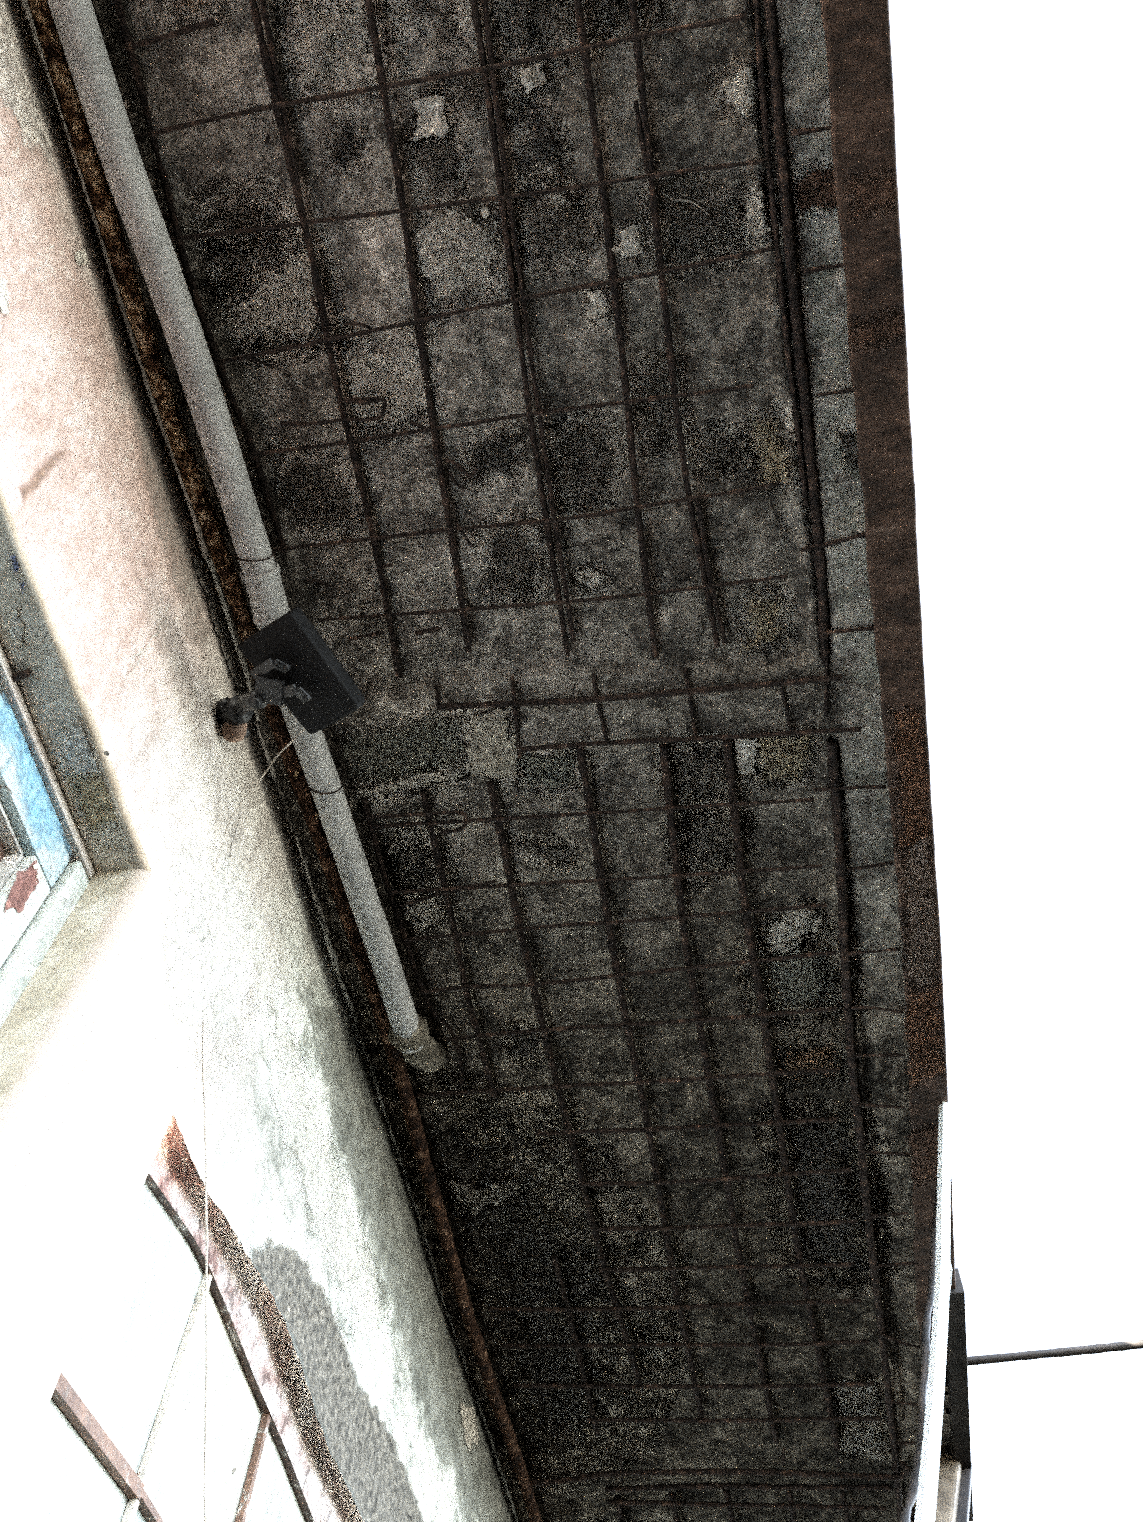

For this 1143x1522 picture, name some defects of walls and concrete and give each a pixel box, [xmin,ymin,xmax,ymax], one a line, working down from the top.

corrosion [22,455,59,496]
spalling [113,0,861,1418]
water stain [760,948,843,1012]
peeling [904,836,938,987]
water stain [415,1111,632,1452]
water stain [775,1112,866,1283]
flaking render [250,1234,435,1522]
spalling [530,1380,911,1522]